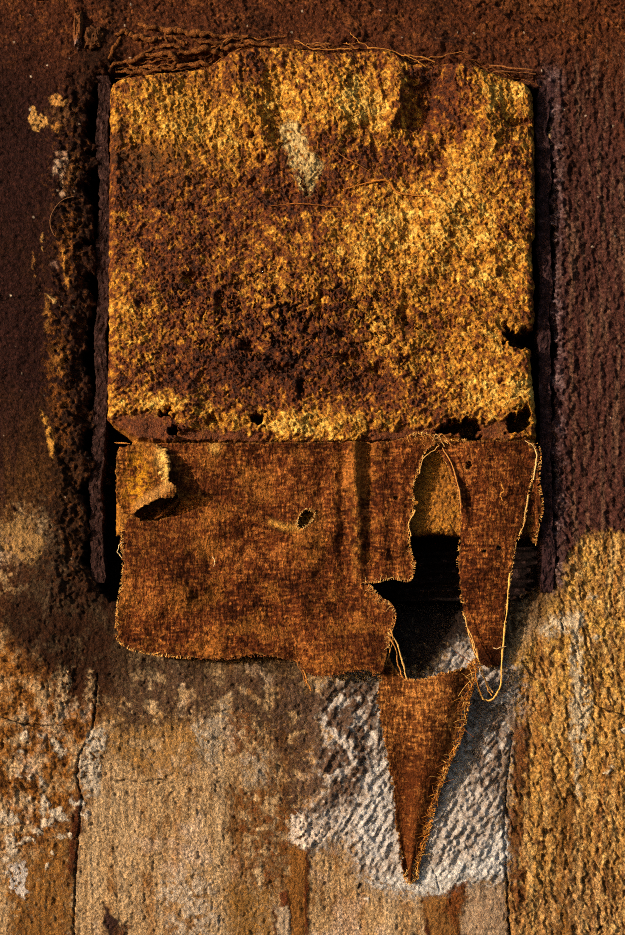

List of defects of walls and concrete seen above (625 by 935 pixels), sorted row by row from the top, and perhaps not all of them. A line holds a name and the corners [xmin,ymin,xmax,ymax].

crack [76,673,98,838]
peeling [289,634,520,935]